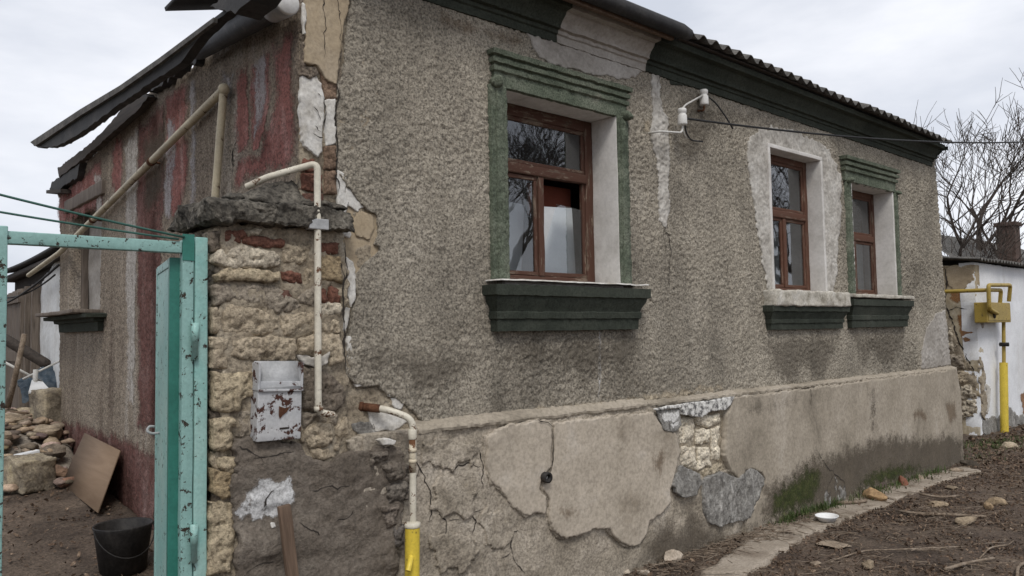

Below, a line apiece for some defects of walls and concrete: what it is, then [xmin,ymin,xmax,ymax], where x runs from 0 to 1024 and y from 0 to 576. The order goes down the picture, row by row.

crack [323,0,342,191]
peeling [234,0,378,358]
flaking render [946,266,974,289]
flaking render [345,378,419,452]
crack [416,462,483,536]
crack [455,450,484,484]
crack [539,420,554,483]
flaking render [514,315,991,540]
water stain [763,436,964,522]